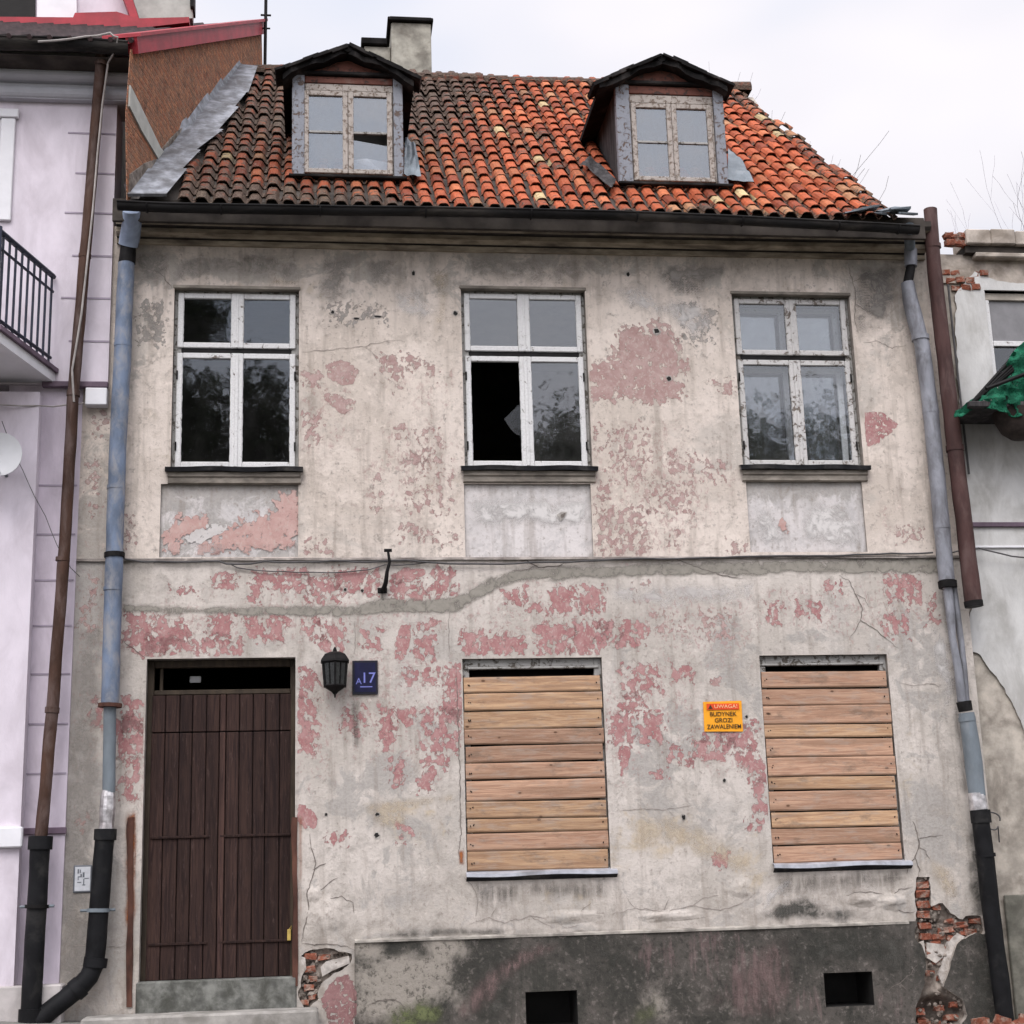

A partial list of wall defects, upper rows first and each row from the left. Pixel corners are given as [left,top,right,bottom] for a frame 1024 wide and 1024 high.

flaking render [942,269,988,292]
peeling [589,300,719,406]
peeling [865,412,898,447]
peeling [121,489,768,833]
crack [839,575,896,647]
peeling [115,694,145,803]
crack [444,562,751,928]
crack [301,841,354,949]
spalling [298,948,357,1024]
spalling [914,876,983,1024]